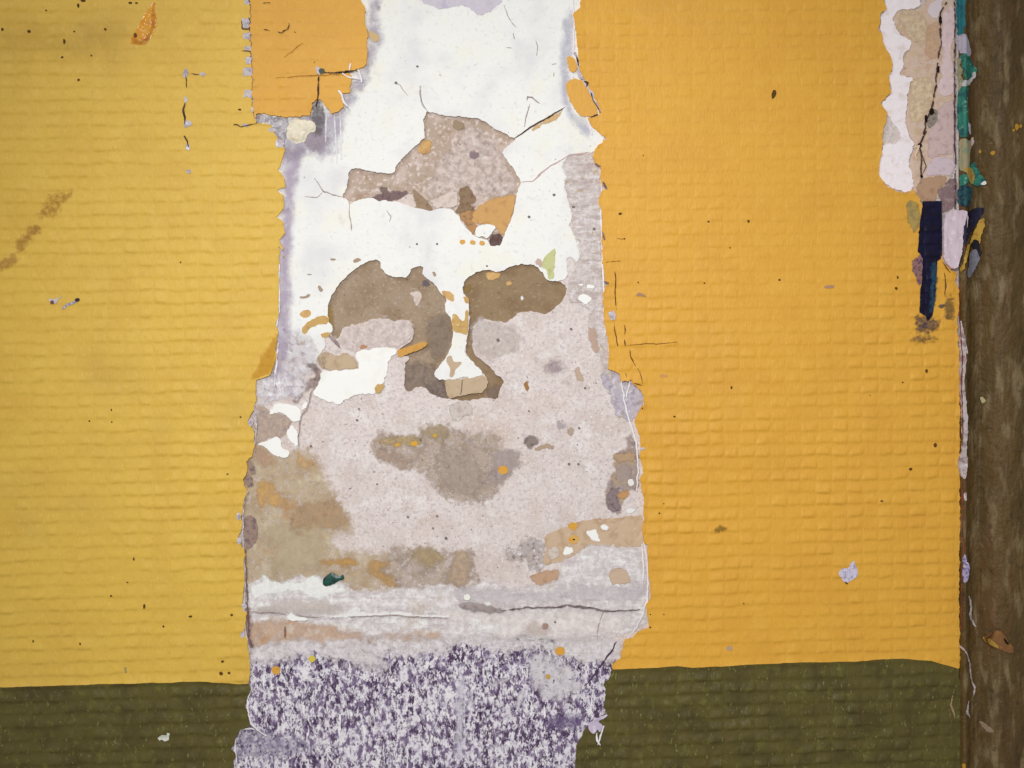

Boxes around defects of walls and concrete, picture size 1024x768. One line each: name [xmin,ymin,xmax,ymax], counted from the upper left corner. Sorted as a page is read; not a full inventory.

crack [514,96,565,139]
flaking render [879,0,986,278]
crack [918,2,956,209]
peeling [255,0,604,446]
crack [606,238,674,385]
damp [243,443,480,591]
damp [372,424,520,505]
peeling [248,524,664,640]
crack [350,602,640,639]